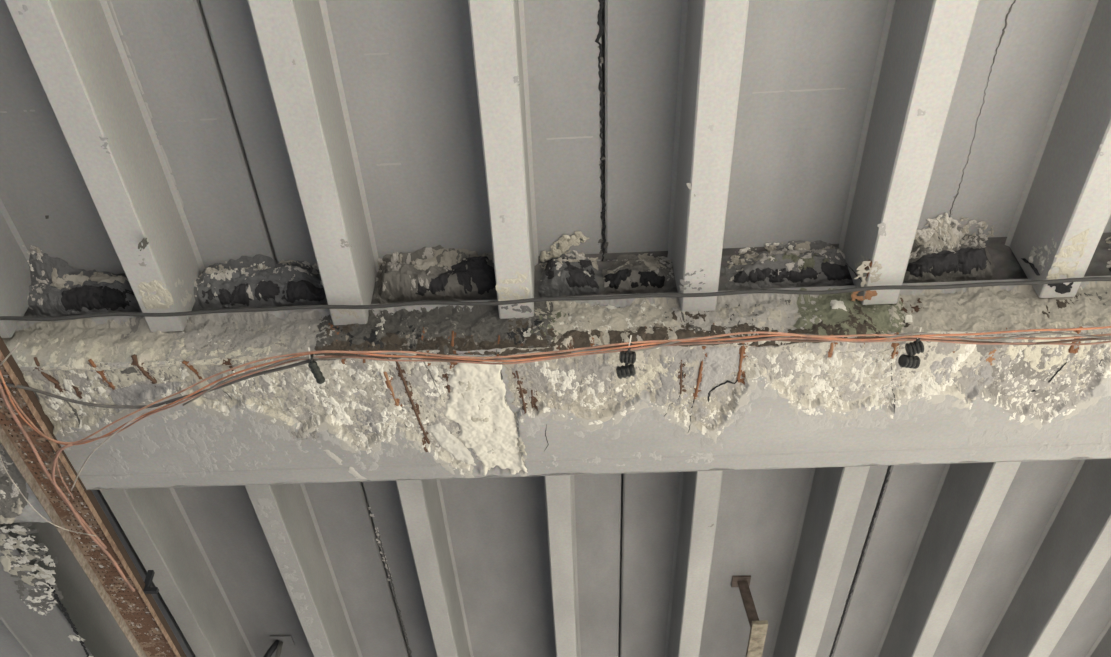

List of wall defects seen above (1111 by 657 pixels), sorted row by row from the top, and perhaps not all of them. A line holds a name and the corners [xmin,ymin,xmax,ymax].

crack [595,0,606,261]
crack [949,0,1016,217]
corrosion [35,367,83,399]
spalling [2,280,473,474]
corrosion [385,367,429,452]
corrosion [512,372,538,414]
corrosion [668,318,748,385]
spalling [496,228,1111,431]
peeling [324,450,366,479]
peeling [0,523,63,610]